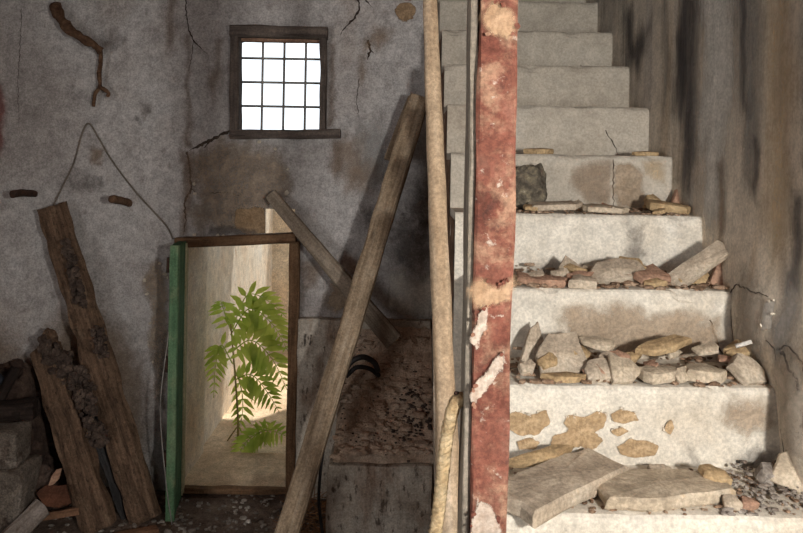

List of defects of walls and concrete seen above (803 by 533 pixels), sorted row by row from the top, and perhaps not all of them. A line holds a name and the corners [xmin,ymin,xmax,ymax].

crack [185,0,206,71]
crack [341,0,372,34]
damp [677,0,758,232]
crack [183,130,229,234]
damp [614,164,644,208]
damp [388,230,432,317]
damp [774,198,801,354]
peeling [470,278,513,349]
peeling [470,351,504,409]
crack [765,340,789,370]
flaking render [551,406,659,458]
peeling [470,498,501,533]